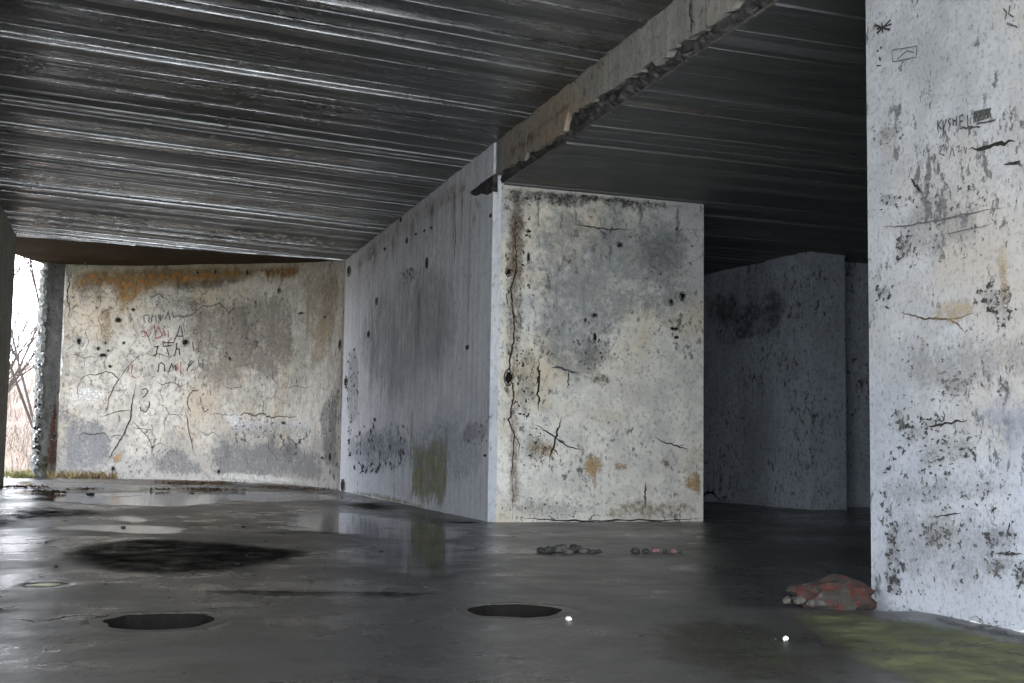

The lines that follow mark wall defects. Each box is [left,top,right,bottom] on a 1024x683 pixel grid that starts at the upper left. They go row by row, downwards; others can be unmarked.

spalling [470,0,774,292]
water stain [64,416,110,472]
rust [75,269,252,302]
water stain [156,450,200,474]
crack [66,270,314,464]
water stain [212,400,336,482]
crack [506,200,697,535]
peeling [880,394,1024,611]